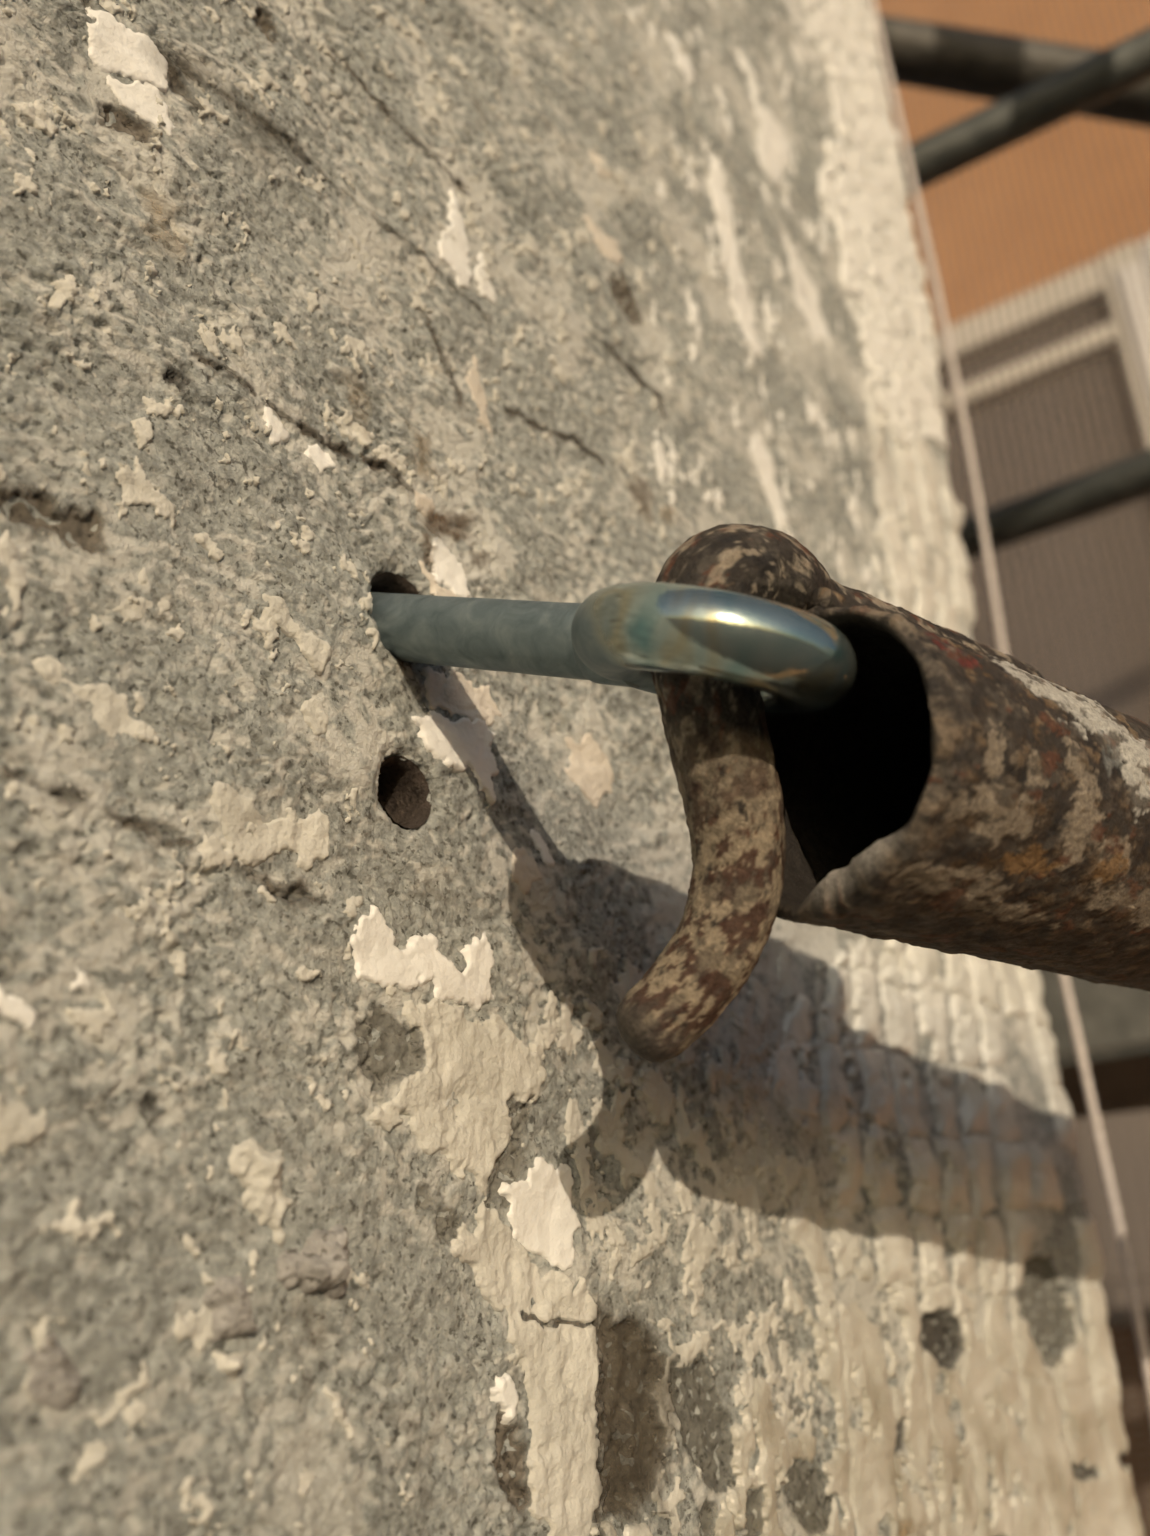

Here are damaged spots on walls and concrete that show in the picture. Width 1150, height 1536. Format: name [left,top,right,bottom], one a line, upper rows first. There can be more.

peeling [0,0,176,212]
crack [162,54,204,110]
crack [331,48,469,195]
crack [427,317,462,406]
crack [605,342,666,417]
crack [505,408,605,466]
peeling [411,666,502,805]
peeling [0,1068,61,1167]
peeling [42,1198,122,1260]
peeling [335,896,846,1536]
spalling [919,1310,962,1369]
peeling [71,1358,150,1484]